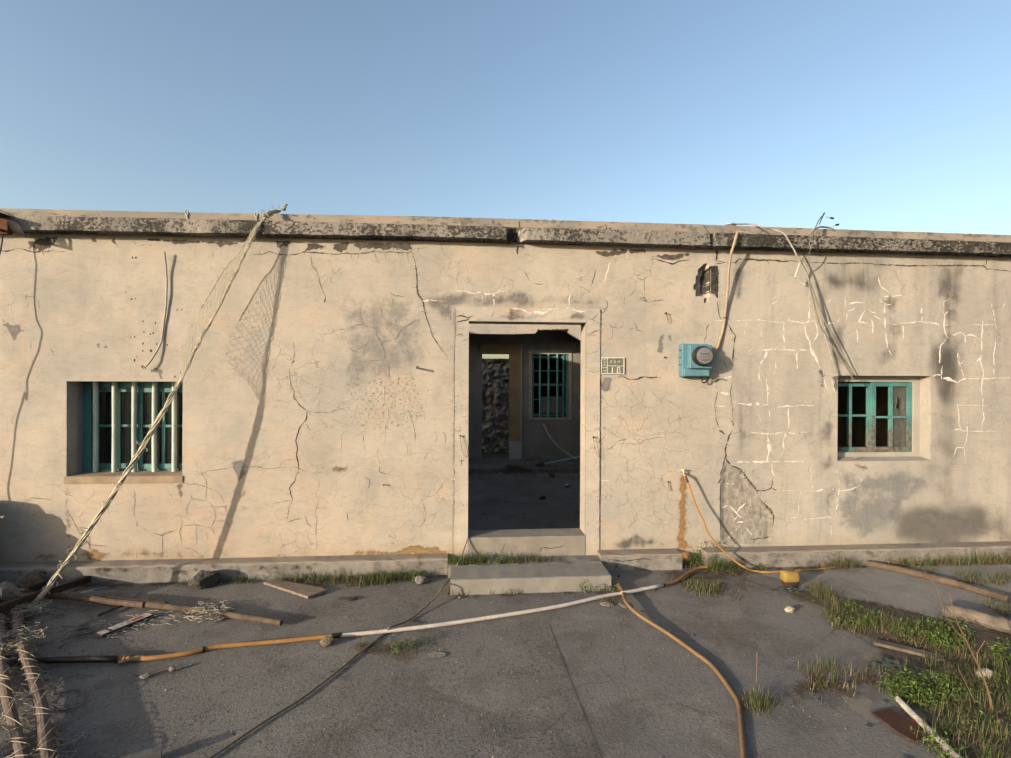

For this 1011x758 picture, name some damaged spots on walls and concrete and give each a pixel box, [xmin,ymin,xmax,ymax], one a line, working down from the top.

flaking render [28,237,58,251]
flaking render [305,242,412,253]
flaking render [596,249,689,265]
crack [704,226,1007,271]
crack [153,342,346,554]
crack [254,224,494,527]
crack [581,270,661,470]
rust [677,475,688,559]
crack [704,301,737,483]
spalling [719,462,775,544]
damp [736,405,988,543]
damp [719,274,1010,463]